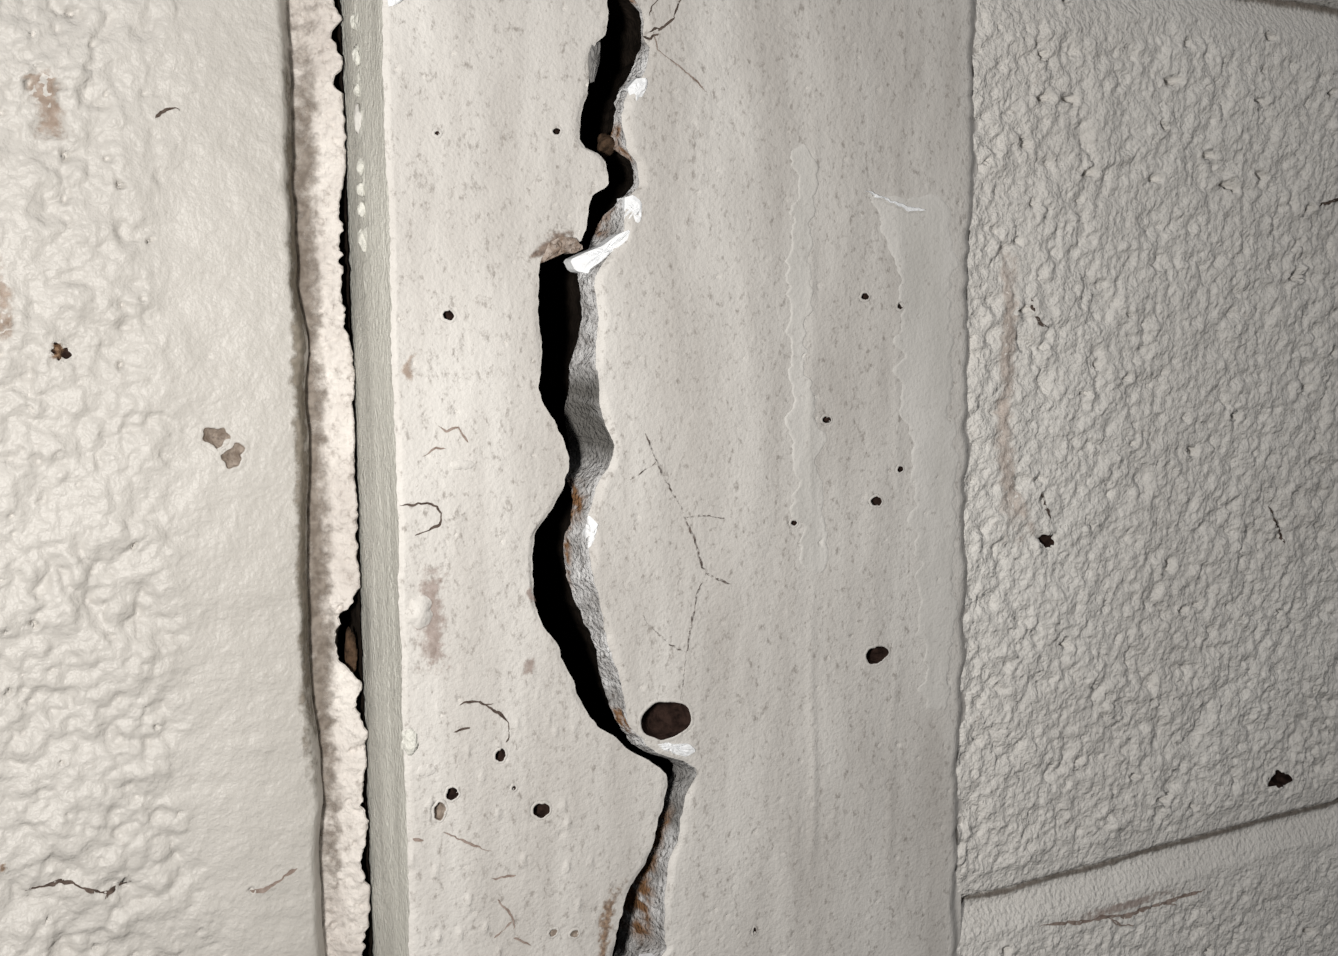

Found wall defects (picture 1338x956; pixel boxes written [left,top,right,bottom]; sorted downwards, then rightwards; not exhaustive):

spalling [197,423,250,474]
leakage [283,69,340,870]
crack [330,0,344,115]
crack [337,158,354,422]
crack [333,456,372,956]
crack [532,0,728,956]